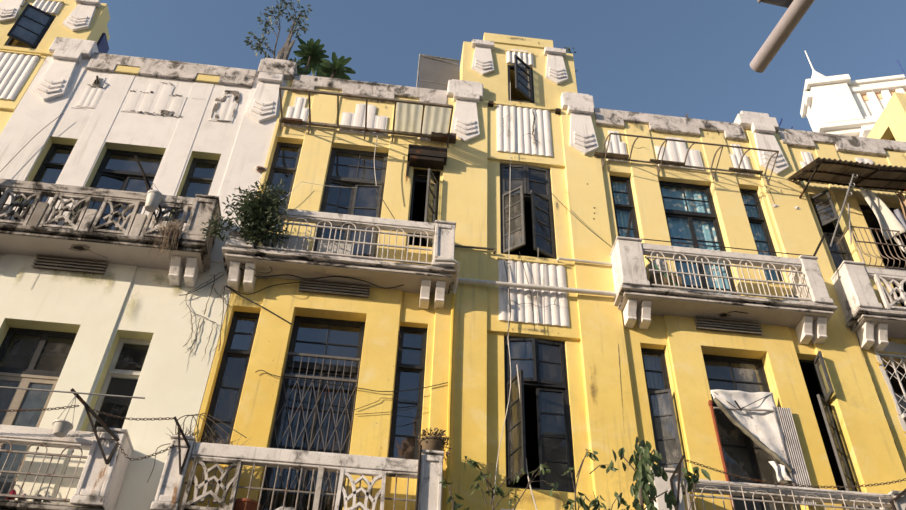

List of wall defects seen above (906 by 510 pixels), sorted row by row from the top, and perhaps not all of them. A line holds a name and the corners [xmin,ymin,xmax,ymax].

spalling [211,90,240,121]
crack [499,110,540,150]